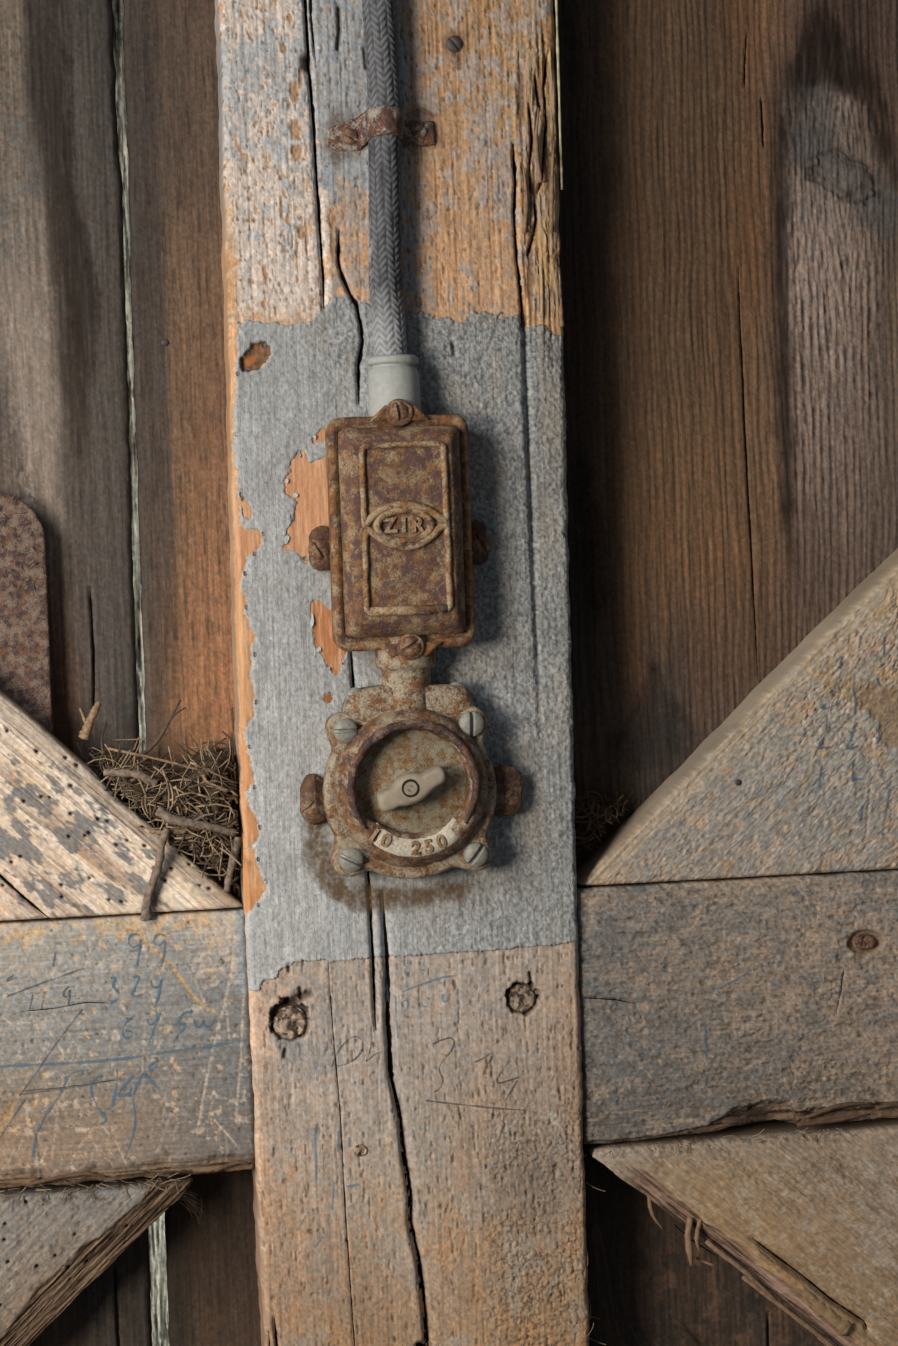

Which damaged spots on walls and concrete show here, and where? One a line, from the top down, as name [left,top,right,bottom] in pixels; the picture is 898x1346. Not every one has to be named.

crack [513,57,547,328]
peeling [283,429,329,564]
peeling [229,341,271,913]
peeling [310,600,346,675]
crack [349,651,357,688]
rust [305,823,463,908]
crack [367,871,429,1346]